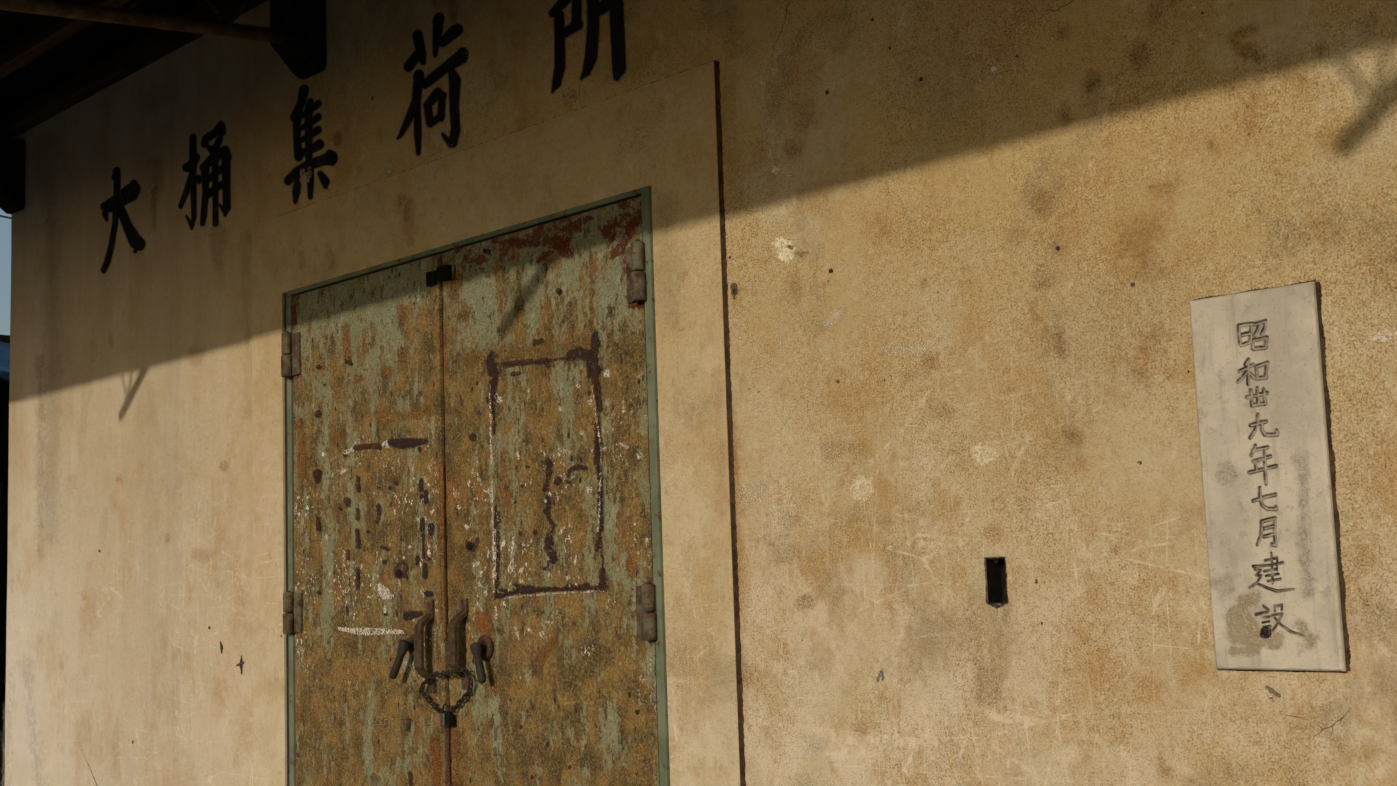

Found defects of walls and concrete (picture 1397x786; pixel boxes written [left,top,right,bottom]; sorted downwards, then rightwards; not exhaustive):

peeling [483,199,642,263]
flaking render [771,236,796,266]